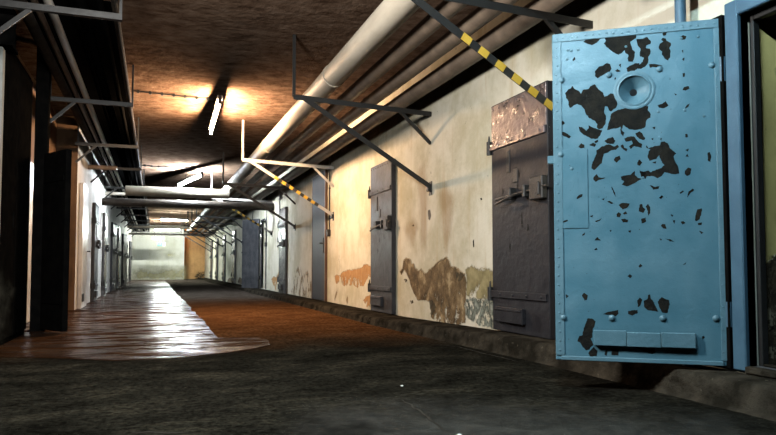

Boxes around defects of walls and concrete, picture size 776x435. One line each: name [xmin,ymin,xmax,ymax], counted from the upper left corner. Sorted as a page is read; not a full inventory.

peeling [565,32,691,199]
peeling [602,187,631,232]
spalling [335,264,371,297]
spalling [400,256,493,328]